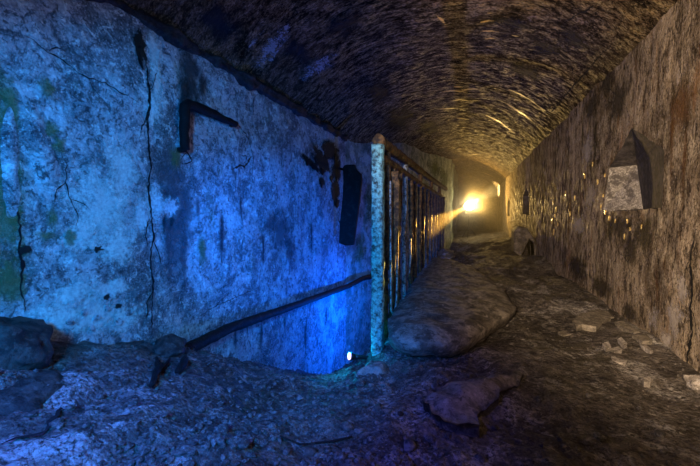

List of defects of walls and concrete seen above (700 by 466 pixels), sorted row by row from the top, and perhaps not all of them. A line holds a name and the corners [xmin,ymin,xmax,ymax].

crack [24,28,161,338]
crack [17,211,26,312]
crack [684,234,696,364]